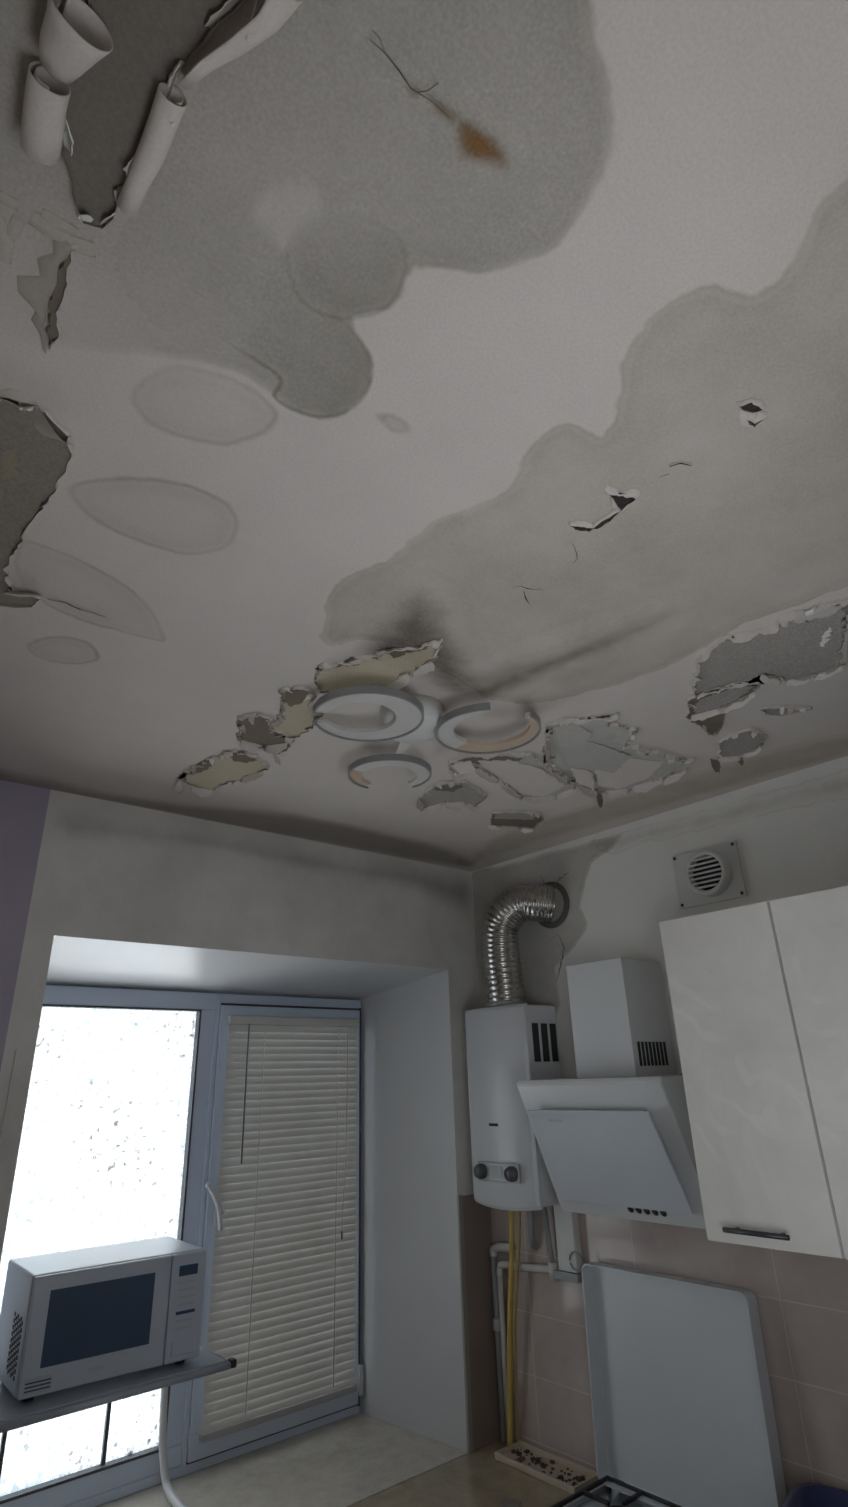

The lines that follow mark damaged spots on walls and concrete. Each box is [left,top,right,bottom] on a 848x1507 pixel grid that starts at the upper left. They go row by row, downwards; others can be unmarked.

peeling [205,0,266,48]
crack [371,30,448,116]
peeling [63,119,74,156]
rust [464,127,500,160]
peeling [78,213,116,225]
peeling [0,388,76,608]
peeling [174,637,443,798]
peeling [416,598,848,833]